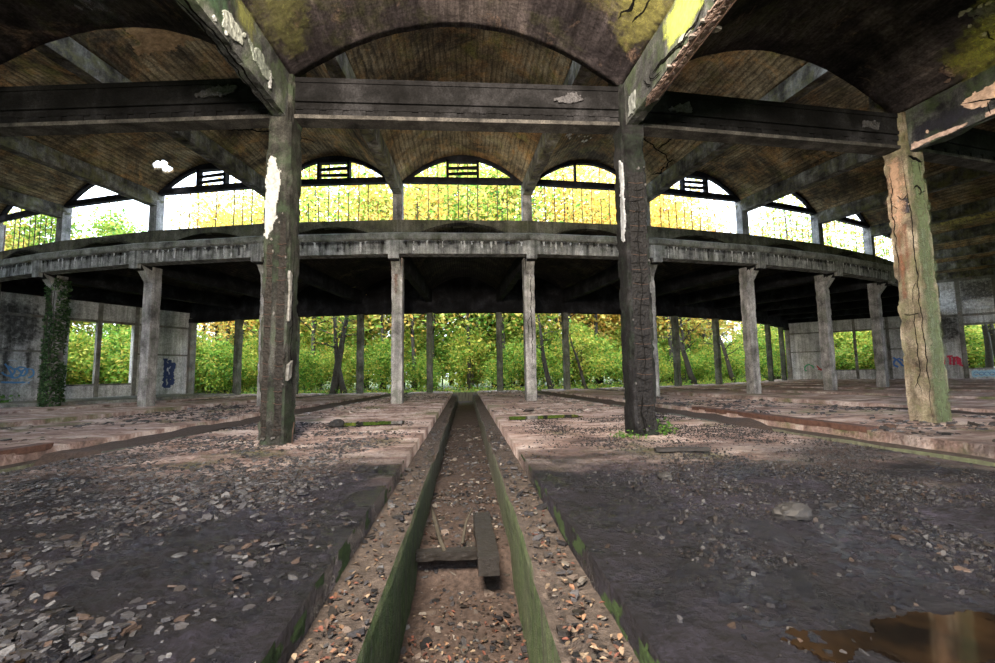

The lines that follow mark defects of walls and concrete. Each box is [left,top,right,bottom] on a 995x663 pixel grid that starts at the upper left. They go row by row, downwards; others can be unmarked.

peeling [212,10,273,89]
crack [618,0,650,22]
damp [620,0,700,48]
damp [944,15,995,78]
flaking render [961,82,995,118]
flaking render [910,122,968,150]
spalling [0,156,287,473]
crack [889,155,934,420]